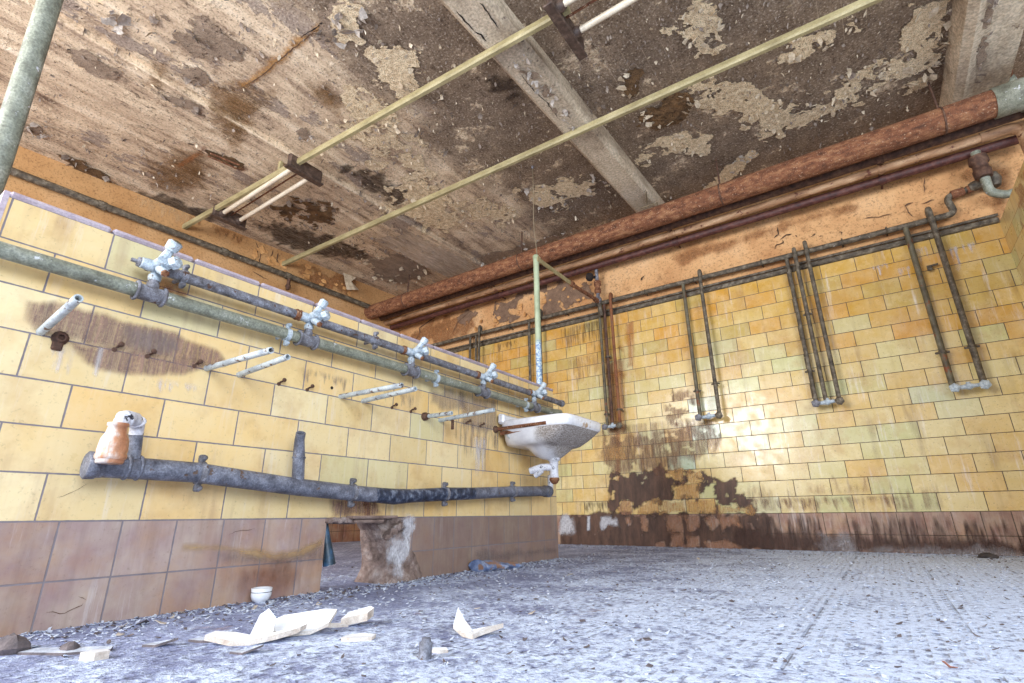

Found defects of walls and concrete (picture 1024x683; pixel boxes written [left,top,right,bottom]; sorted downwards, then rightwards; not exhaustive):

leakage [138,153,242,243]
peeling [23,0,634,299]
peeling [547,0,952,190]
leakage [31,303,222,374]
spalling [621,469,753,549]
leakage [560,392,1024,556]